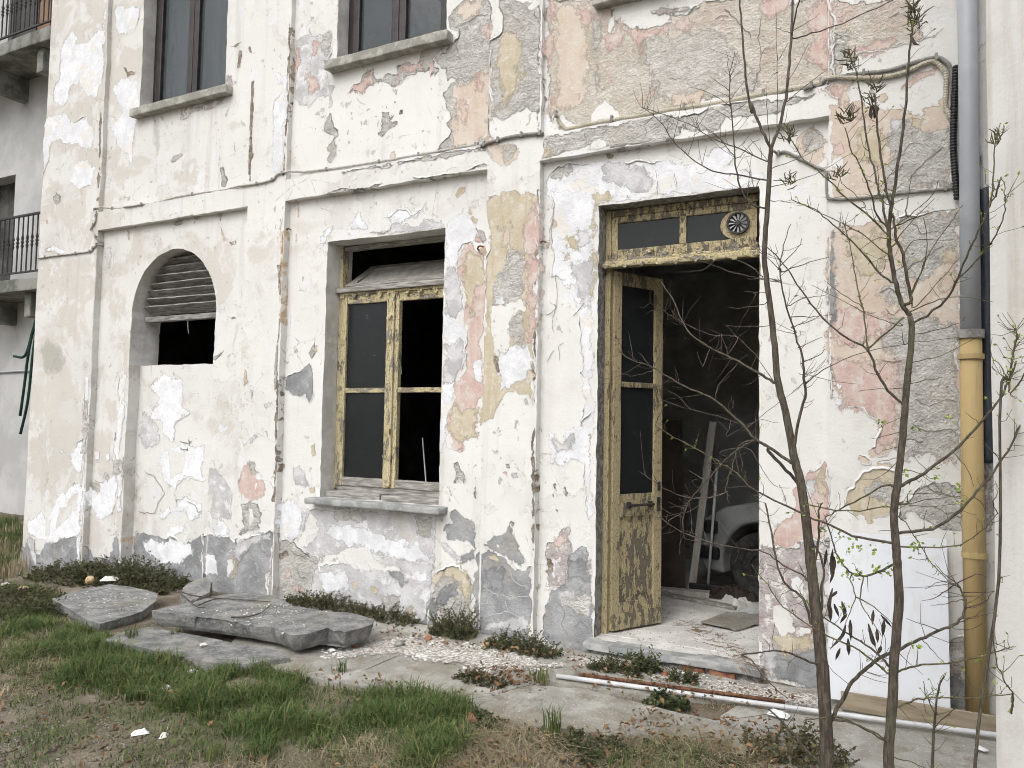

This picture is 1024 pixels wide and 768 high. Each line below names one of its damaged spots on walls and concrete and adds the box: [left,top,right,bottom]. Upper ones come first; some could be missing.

peeling [43,4,141,201]
flaking render [272,24,338,175]
flaking render [349,0,962,531]
peeling [138,314,317,539]
flaking render [441,428,572,590]
flaking render [759,461,831,690]